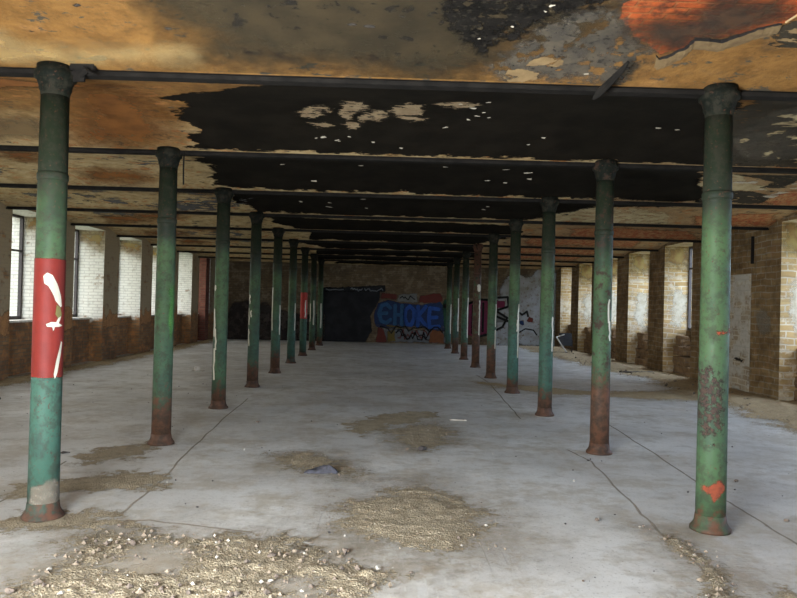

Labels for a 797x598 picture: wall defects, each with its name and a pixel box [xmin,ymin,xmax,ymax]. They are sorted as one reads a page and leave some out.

damp [0,38,63,59]
peeling [503,57,563,83]
damp [489,6,657,85]
flaking render [619,0,797,71]
peeling [298,100,430,142]
peeling [436,101,491,121]
peeling [732,100,797,227]
flaking render [613,208,702,240]
crack [117,398,251,532]
crack [609,425,696,482]
crack [568,450,715,581]
crack [727,501,797,545]